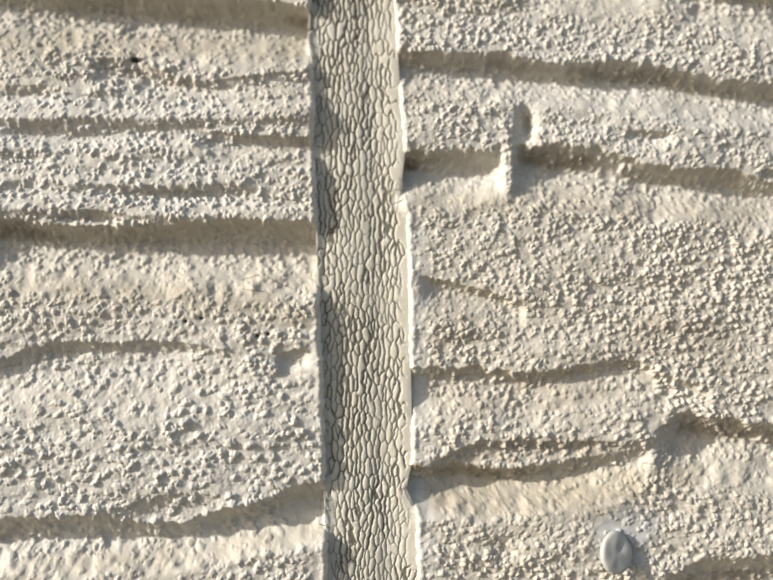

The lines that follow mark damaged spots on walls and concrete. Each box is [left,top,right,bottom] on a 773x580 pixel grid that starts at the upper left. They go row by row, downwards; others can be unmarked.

crack [309,0,417,580]